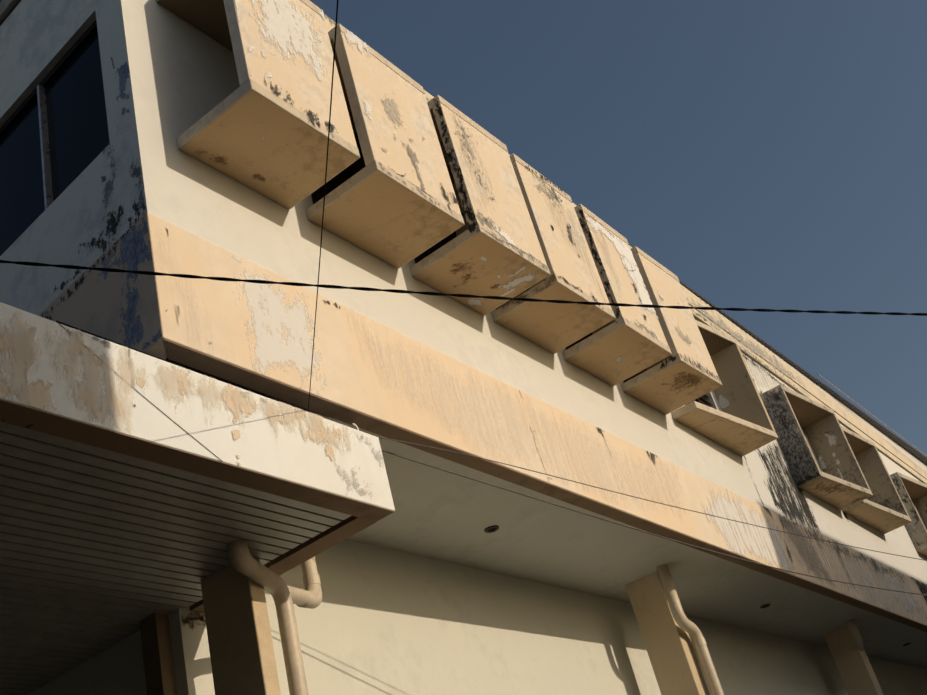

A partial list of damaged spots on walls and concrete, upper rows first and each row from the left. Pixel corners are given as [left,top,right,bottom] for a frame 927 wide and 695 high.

peeling [248,0,325,80]
mould [39,144,147,320]
peeling [54,220,162,430]
peeling [233,257,327,395]
peeling [497,266,537,297]
damp [379,98,657,339]
peeling [586,217,658,319]
peeling [0,371,56,409]
peeling [157,365,352,461]
damp [678,298,927,603]
peeling [703,488,794,574]